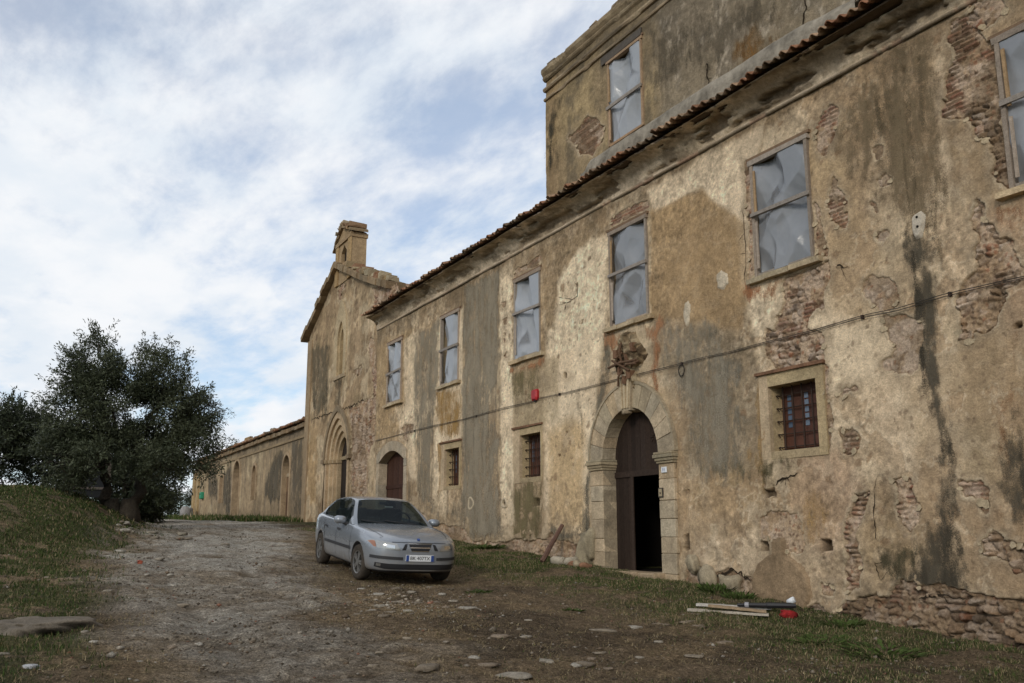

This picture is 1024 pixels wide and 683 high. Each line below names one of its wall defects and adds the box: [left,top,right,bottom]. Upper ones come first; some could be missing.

spalling [569,116,606,156]
spalling [812,105,840,156]
spalling [942,0,1009,189]
spalling [765,178,861,455]
damp [837,38,968,589]
spalling [954,199,1023,345]
spalling [889,475,922,532]
spalling [811,492,1024,651]
spalling [957,480,990,514]